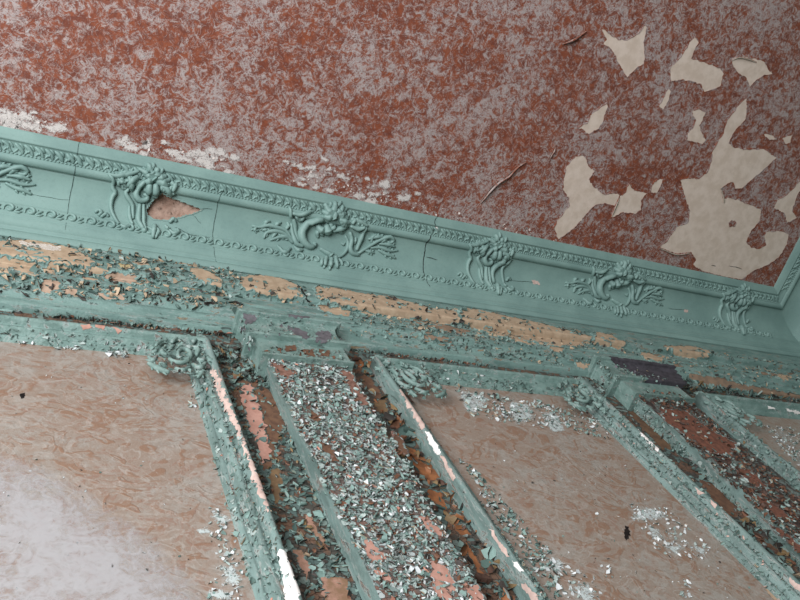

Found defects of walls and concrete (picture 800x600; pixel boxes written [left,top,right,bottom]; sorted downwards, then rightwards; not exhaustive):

peeling [601,25,647,78]
peeling [658,36,724,111]
peeling [577,102,609,135]
spalling [146,192,204,221]
peeling [552,154,664,241]
peeling [660,55,800,280]
peeling [0,236,800,600]